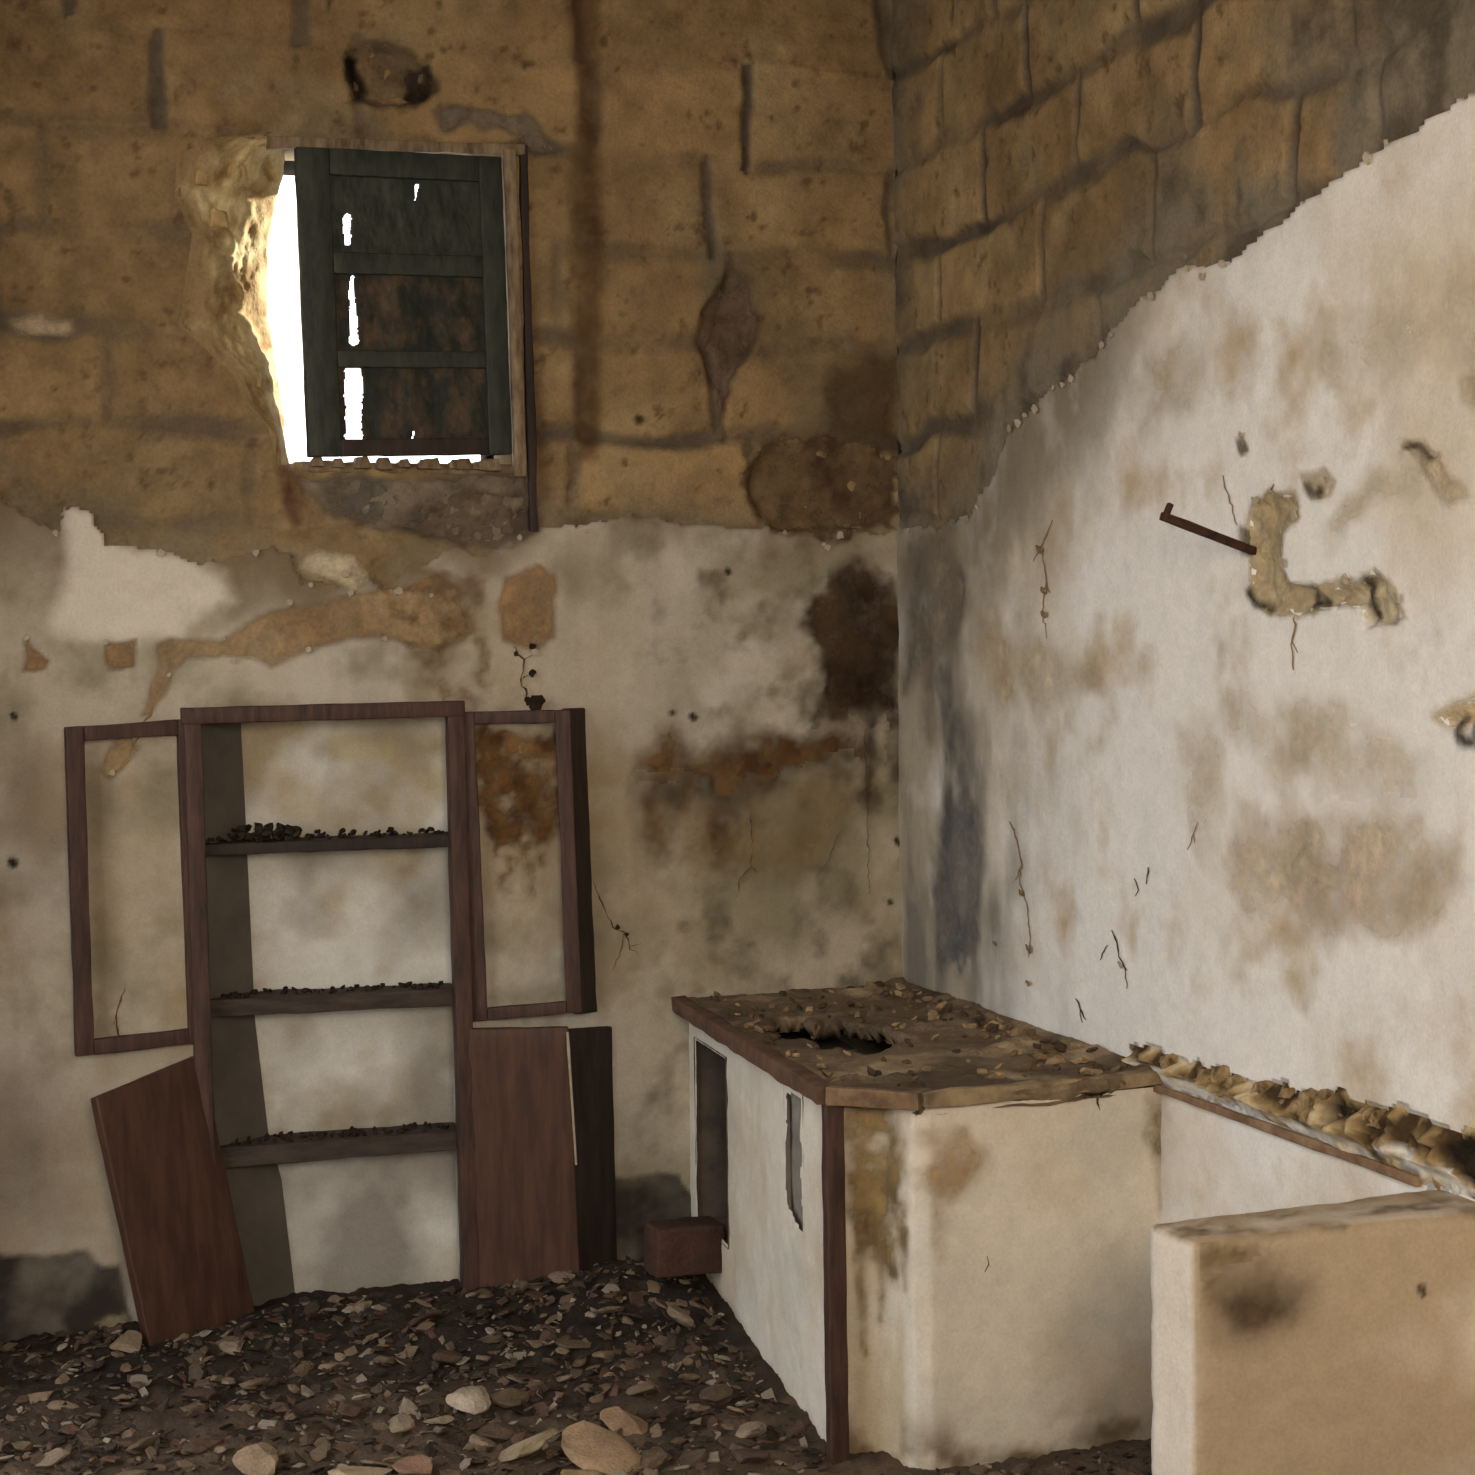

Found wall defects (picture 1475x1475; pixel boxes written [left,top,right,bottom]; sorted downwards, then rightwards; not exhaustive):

flaking render [0,0,1475,779]
leakage [676,534,965,863]
leakage [934,796,980,965]
spalling [1452,1142,1475,1180]